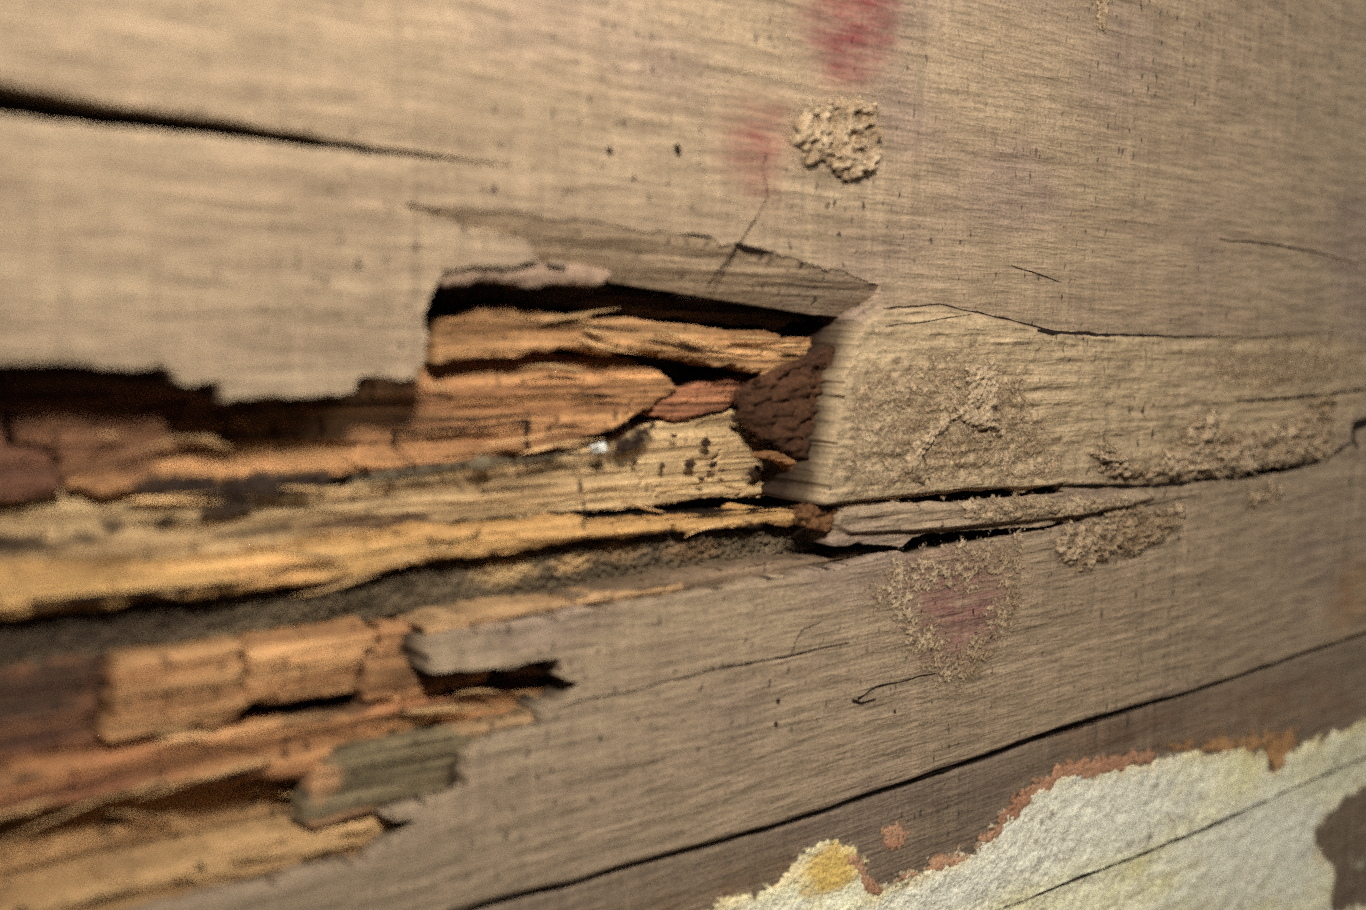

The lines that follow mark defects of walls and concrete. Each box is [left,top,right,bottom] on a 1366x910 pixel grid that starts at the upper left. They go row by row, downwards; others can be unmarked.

crack [1236,388,1366,463]
crack [821,489,1000,509]
crack [1057,465,1280,517]
spalling [0,205,890,910]
crack [857,530,979,549]
crack [997,756,1366,910]